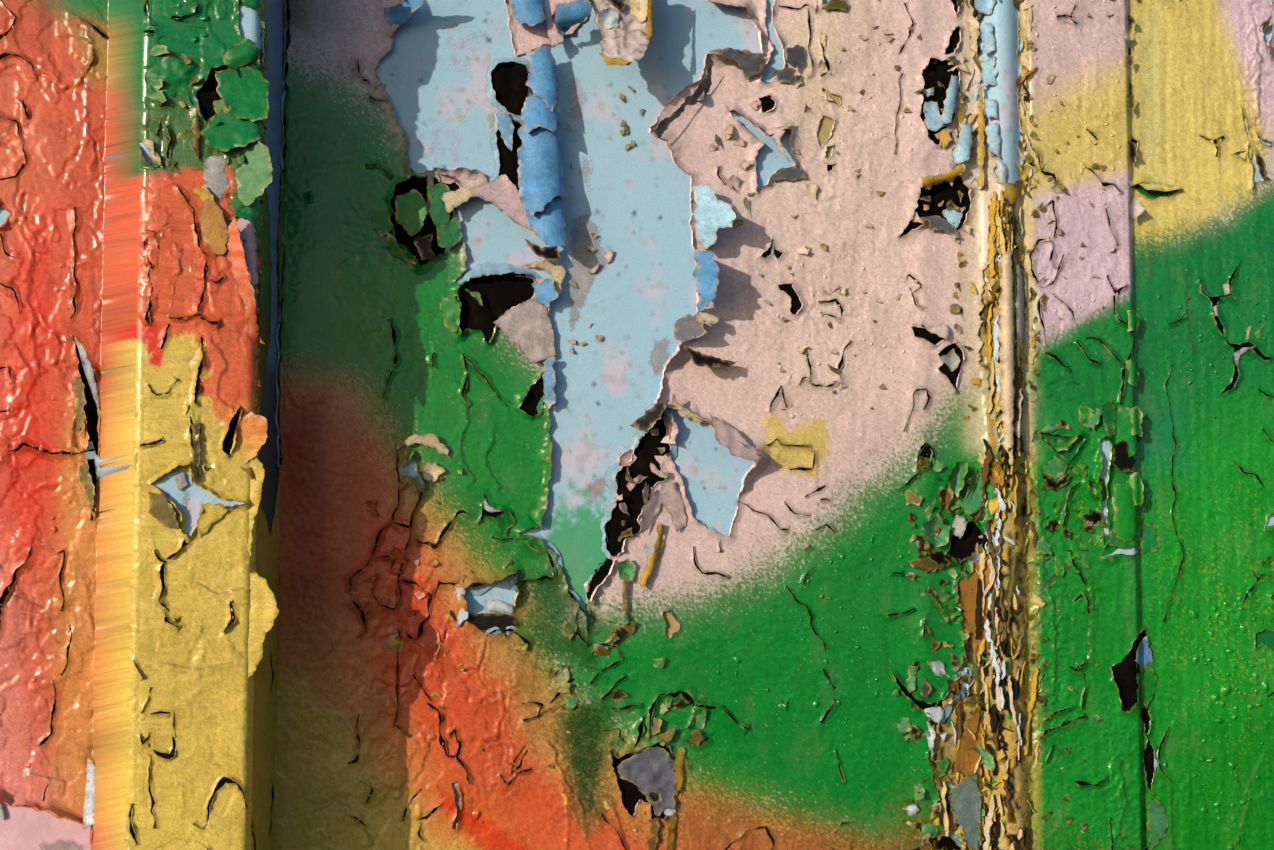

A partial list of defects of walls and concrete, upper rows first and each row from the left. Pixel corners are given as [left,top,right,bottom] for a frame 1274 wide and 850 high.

crack [0,542,76,750]
peeling [62,0,287,678]
crack [138,95,230,474]
crack [125,651,276,850]
crack [342,446,752,850]
peeling [368,0,854,656]
peeling [588,694,707,850]
crack [735,295,855,785]
crack [889,667,972,757]
peeling [891,0,1107,850]
peeling [1129,471,1147,510]
peeling [1135,636,1157,709]